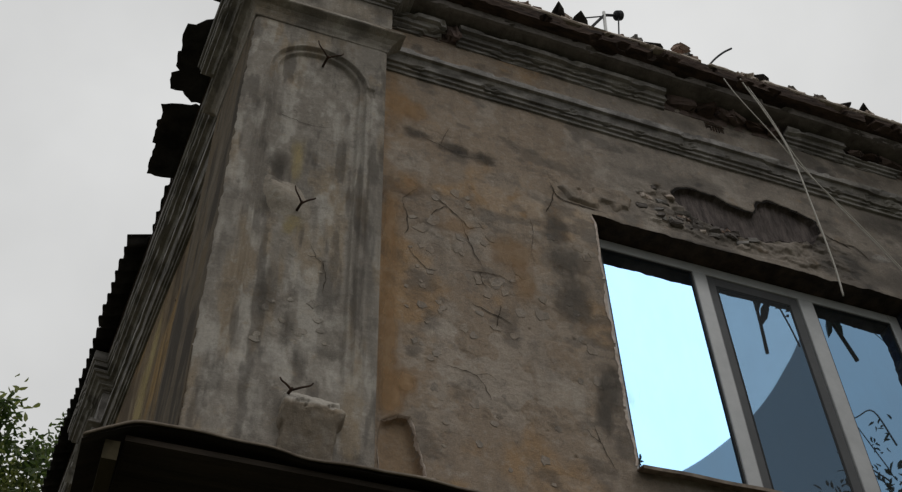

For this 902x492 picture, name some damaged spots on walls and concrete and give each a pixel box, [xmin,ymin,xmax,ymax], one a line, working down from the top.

flaking render [845,149,902,175]
spalling [635,185,821,246]
spalling [591,216,638,467]
spalling [377,414,435,479]